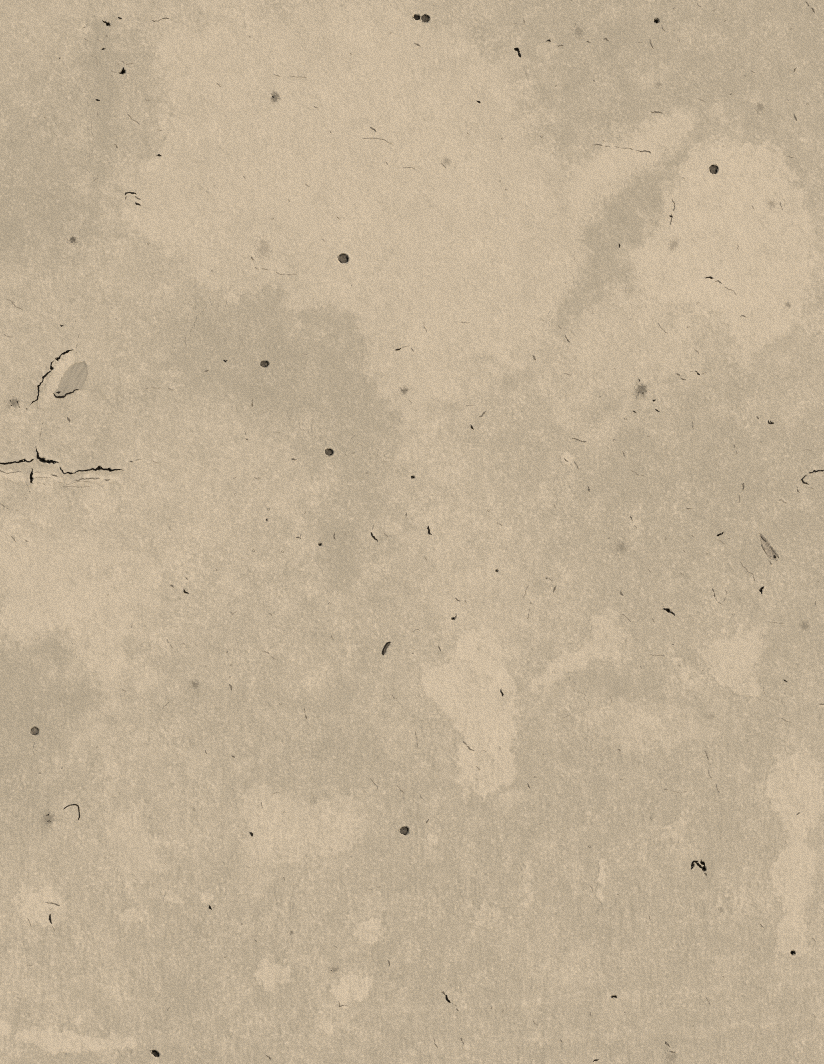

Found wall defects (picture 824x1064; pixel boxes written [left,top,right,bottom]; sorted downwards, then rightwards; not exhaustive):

spalling [53,361,88,398]
crack [0,324,158,511]